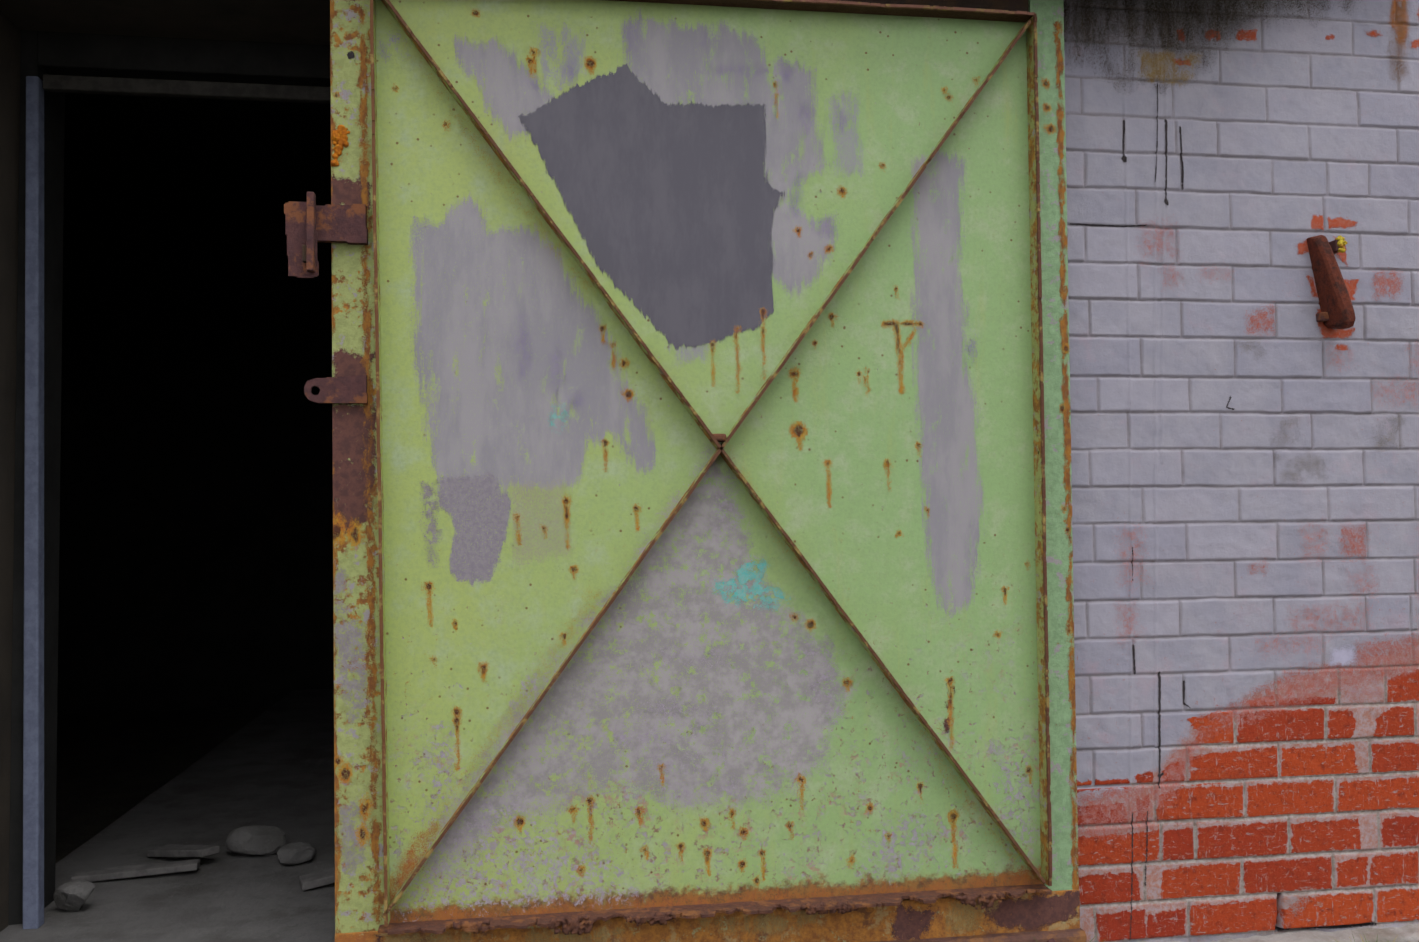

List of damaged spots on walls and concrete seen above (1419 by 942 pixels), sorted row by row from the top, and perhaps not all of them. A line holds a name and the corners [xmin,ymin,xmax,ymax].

corrosion [330,0,1042,935]
peeling [1077,518,1419,942]